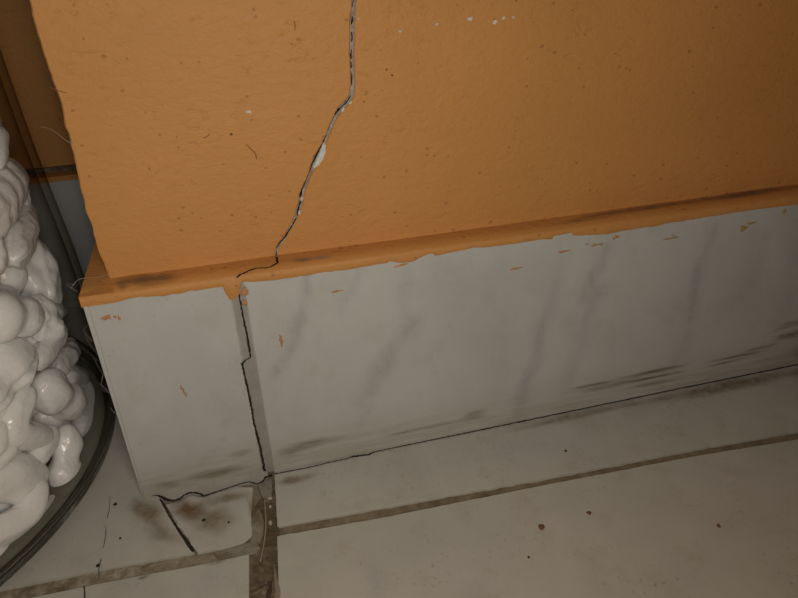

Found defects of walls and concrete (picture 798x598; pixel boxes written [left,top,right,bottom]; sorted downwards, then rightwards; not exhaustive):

crack [83,497,111,598]
crack [153,0,798,552]